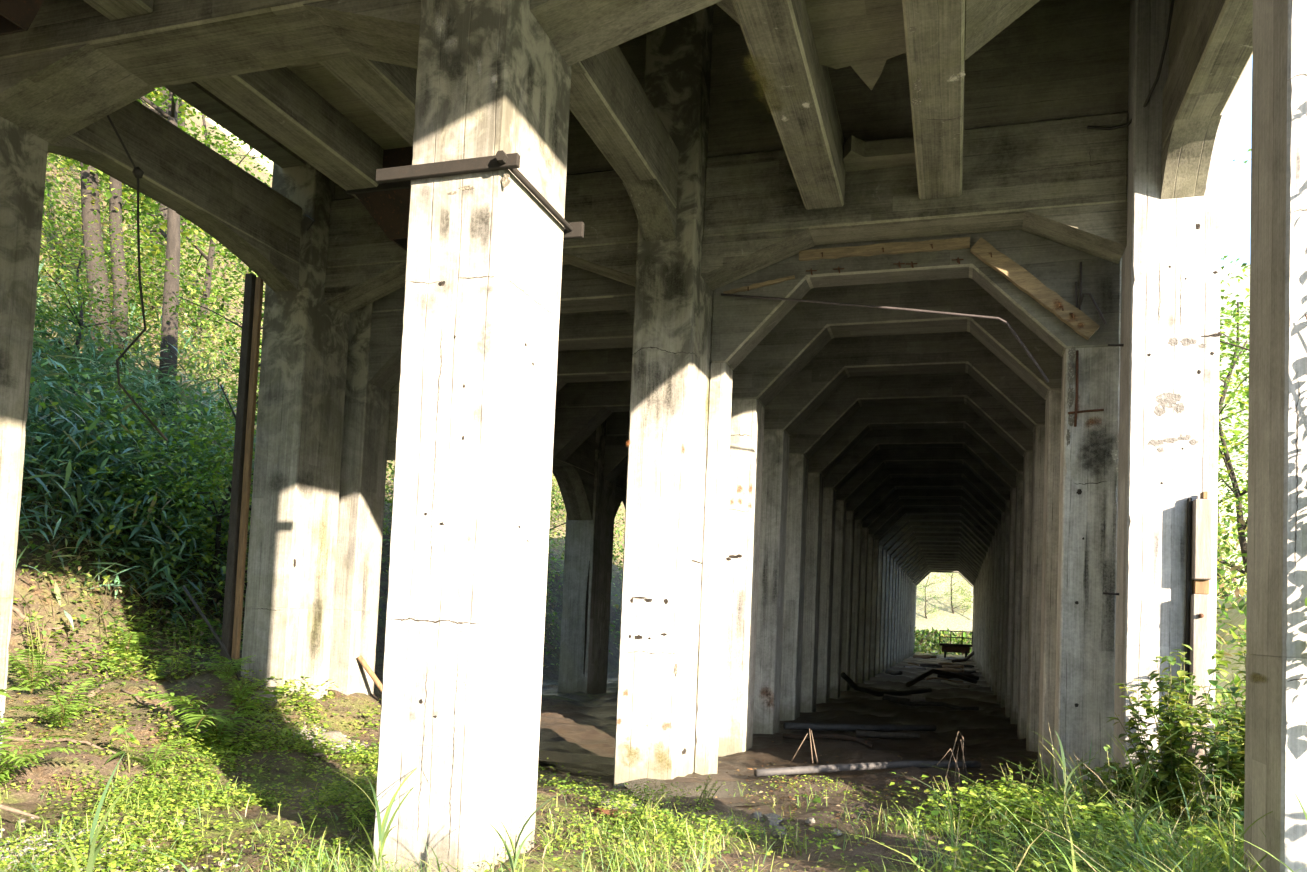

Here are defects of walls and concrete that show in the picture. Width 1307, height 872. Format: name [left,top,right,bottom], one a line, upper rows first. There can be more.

corrosion [1068,350,1104,427]